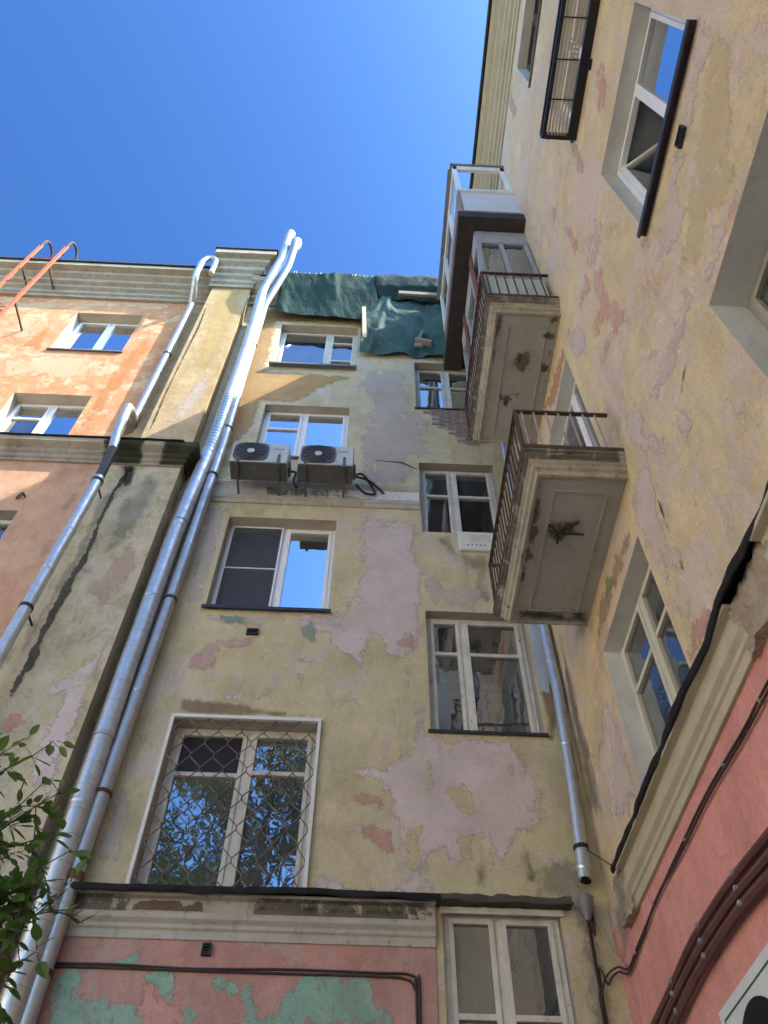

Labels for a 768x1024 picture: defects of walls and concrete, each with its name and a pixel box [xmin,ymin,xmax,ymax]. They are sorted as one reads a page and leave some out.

peeling [568,267,623,360]
peeling [298,371,491,501]
peeling [298,521,425,686]
leakage [182,700,284,715]
peeling [354,697,542,893]
spalling [128,899,203,911]
peeling [315,874,352,890]
peeling [47,952,198,1024]
peeling [211,968,396,1024]